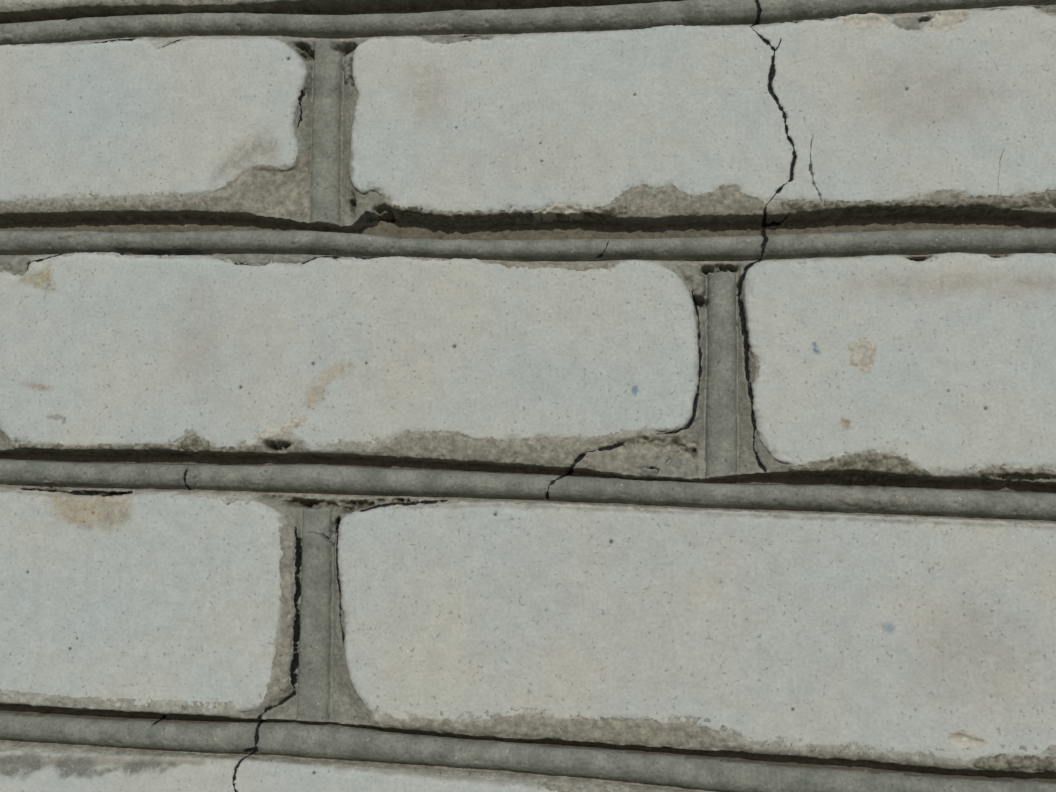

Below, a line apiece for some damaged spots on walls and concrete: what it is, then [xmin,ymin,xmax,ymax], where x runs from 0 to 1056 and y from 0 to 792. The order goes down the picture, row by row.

crack [738,0,845,475]
spalling [781,189,1056,221]
crack [658,290,702,434]
crack [546,444,623,497]
crack [233,500,449,792]
spalling [946,729,1056,772]